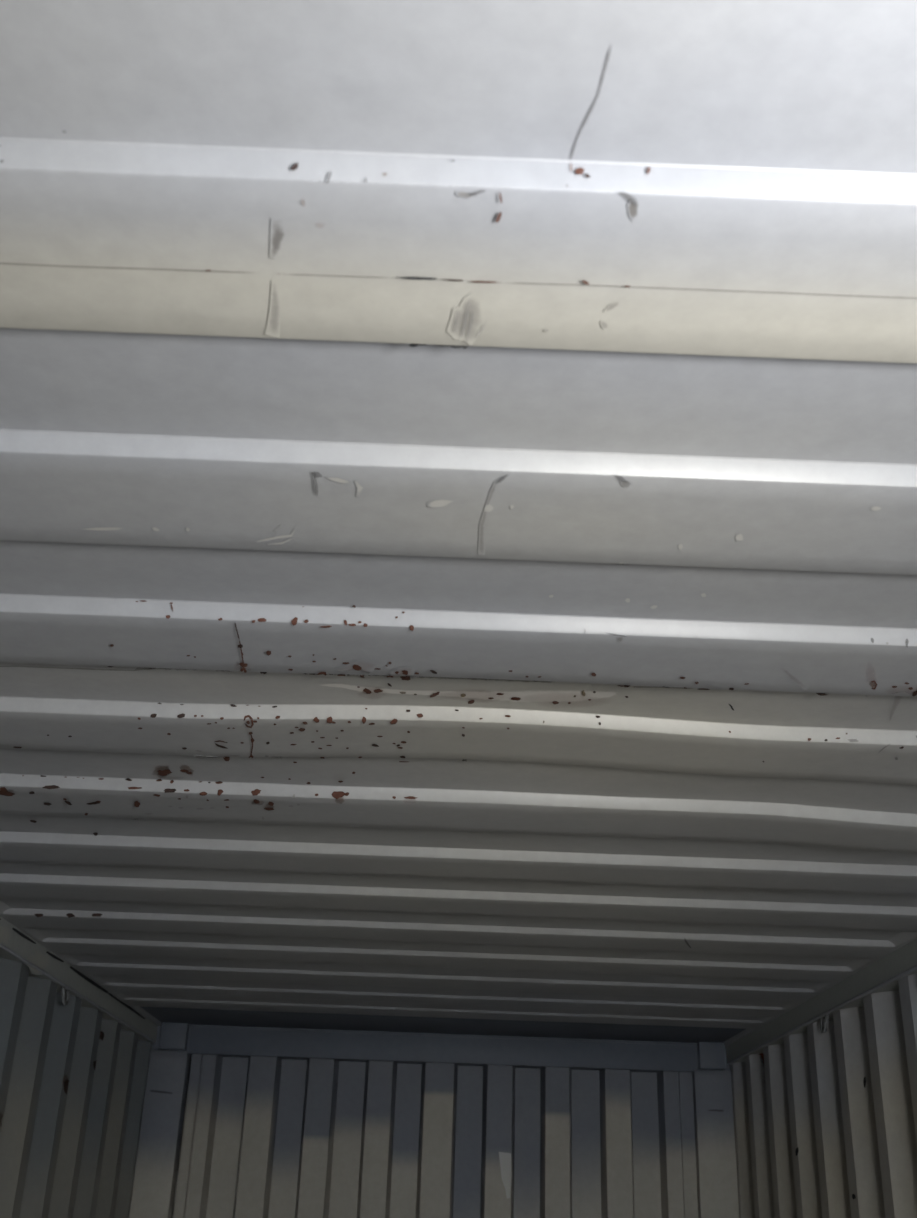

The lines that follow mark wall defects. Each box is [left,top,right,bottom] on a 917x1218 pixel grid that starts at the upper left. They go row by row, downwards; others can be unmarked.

rust [291,605,368,628]
rust [218,618,247,673]
rust [312,654,437,687]
rust [126,704,423,820]
rust [29,775,84,806]